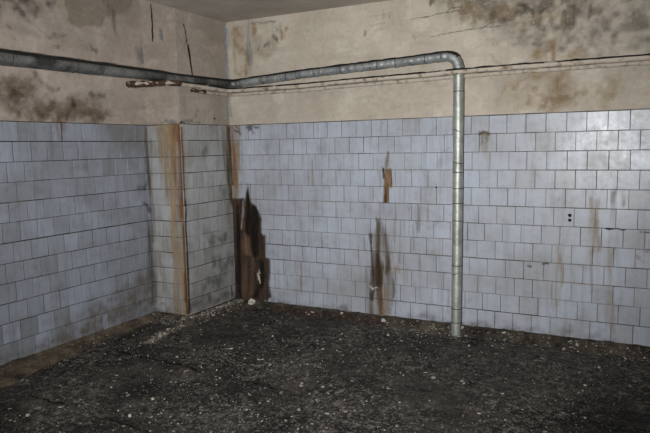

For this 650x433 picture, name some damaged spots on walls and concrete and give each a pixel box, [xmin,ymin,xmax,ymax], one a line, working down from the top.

crack [183,23,193,75]
corrosion [160,121,190,316]
corrosion [226,144,238,202]
spalling [232,190,271,301]
corrosion [369,220,389,315]